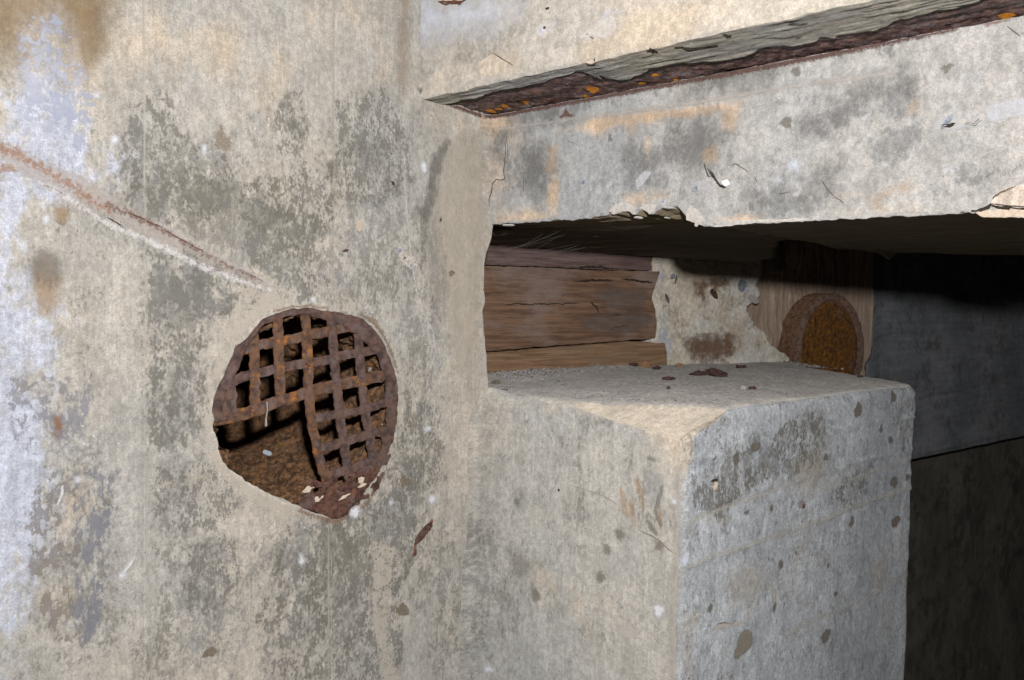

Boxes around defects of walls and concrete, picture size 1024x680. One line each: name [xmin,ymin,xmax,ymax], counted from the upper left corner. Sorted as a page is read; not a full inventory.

peeling [478,53,512,77]
corrosion [446,28,959,118]
peeling [933,97,1024,130]
crack [489,137,524,199]
crack [0,143,276,294]
peeling [609,199,667,215]
peeling [686,205,806,227]
peeling [960,184,1024,218]
water stain [33,254,57,307]
corrosion [298,453,391,525]
corrosion [413,519,433,557]